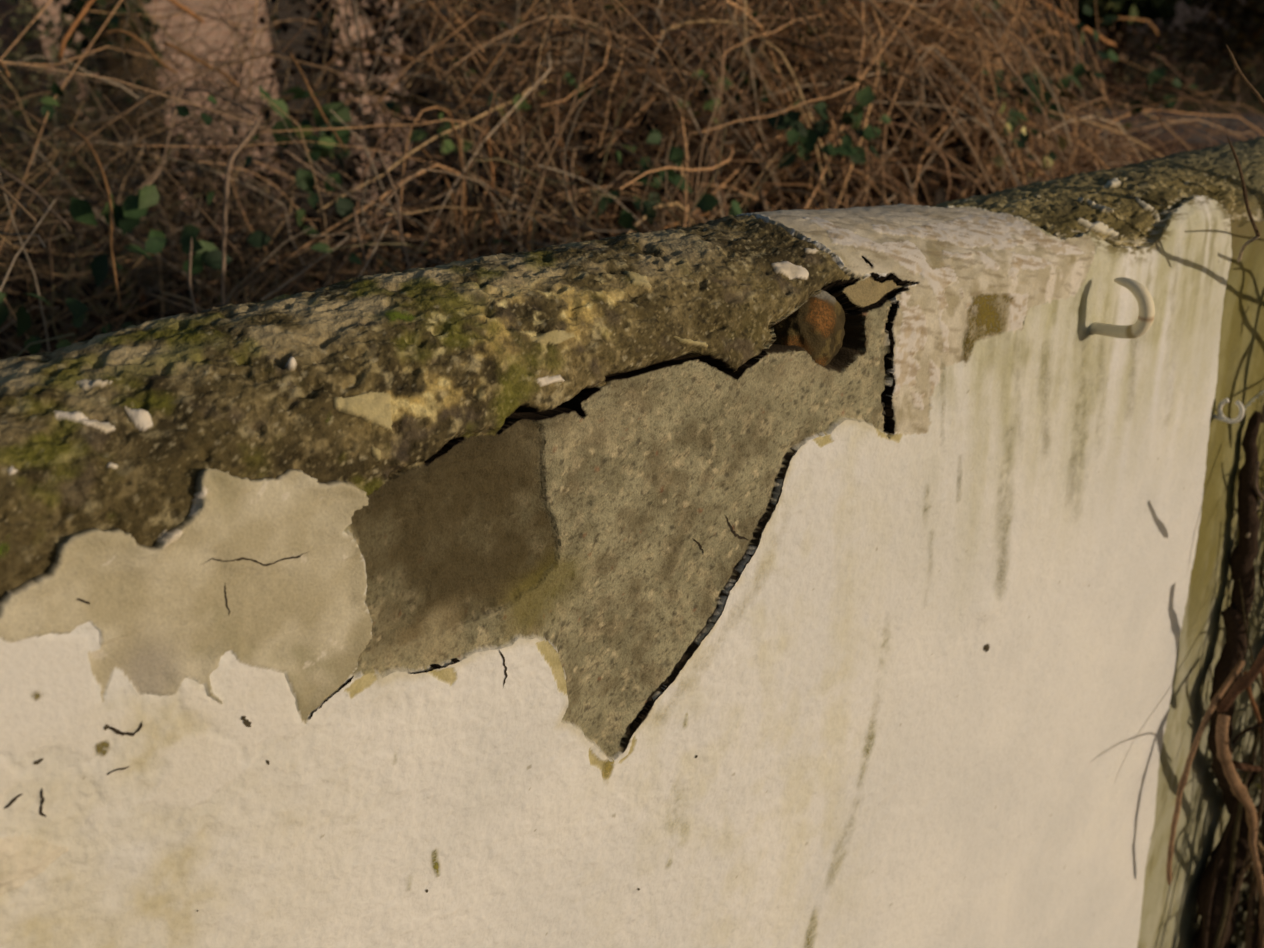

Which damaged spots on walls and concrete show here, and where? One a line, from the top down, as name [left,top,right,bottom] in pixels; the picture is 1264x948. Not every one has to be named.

peeling [1106,178,1121,188]
peeling [1134,197,1168,224]
crack [822,256,918,434]
crack [497,351,767,434]
crack [425,436,464,465]
spalling [0,197,1119,781]
crack [626,451,797,749]